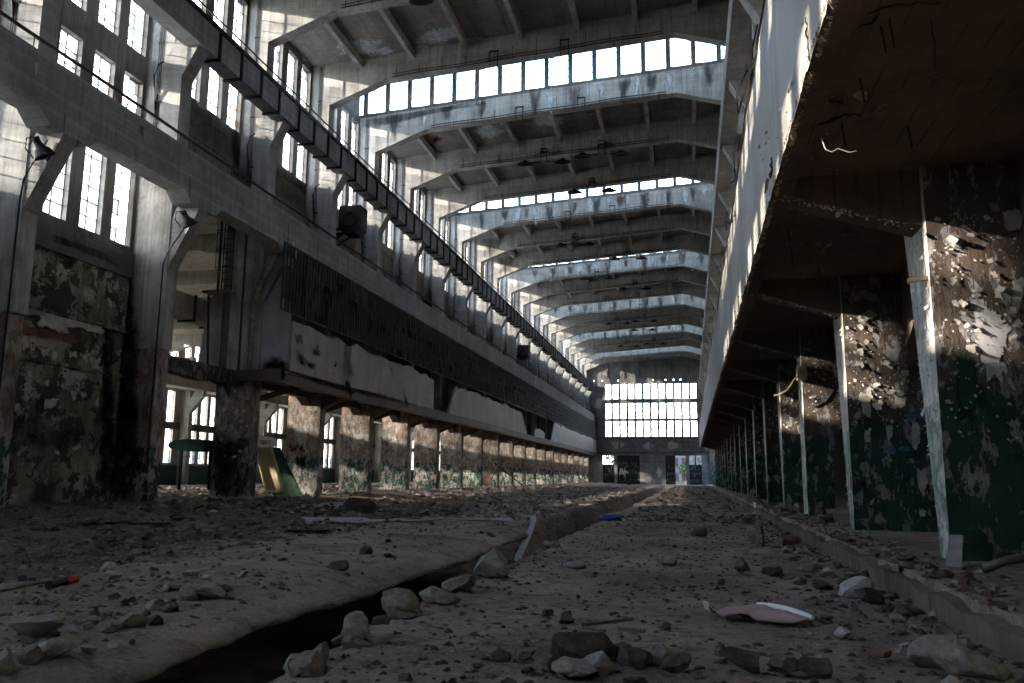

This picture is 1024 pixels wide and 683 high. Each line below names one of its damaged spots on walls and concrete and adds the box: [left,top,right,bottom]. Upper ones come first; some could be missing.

leakage [531,91,565,126]
leakage [620,74,671,96]
peeling [705,0,1024,512]
peeling [22,273,105,361]
peeling [43,380,58,409]
peeling [916,468,944,534]